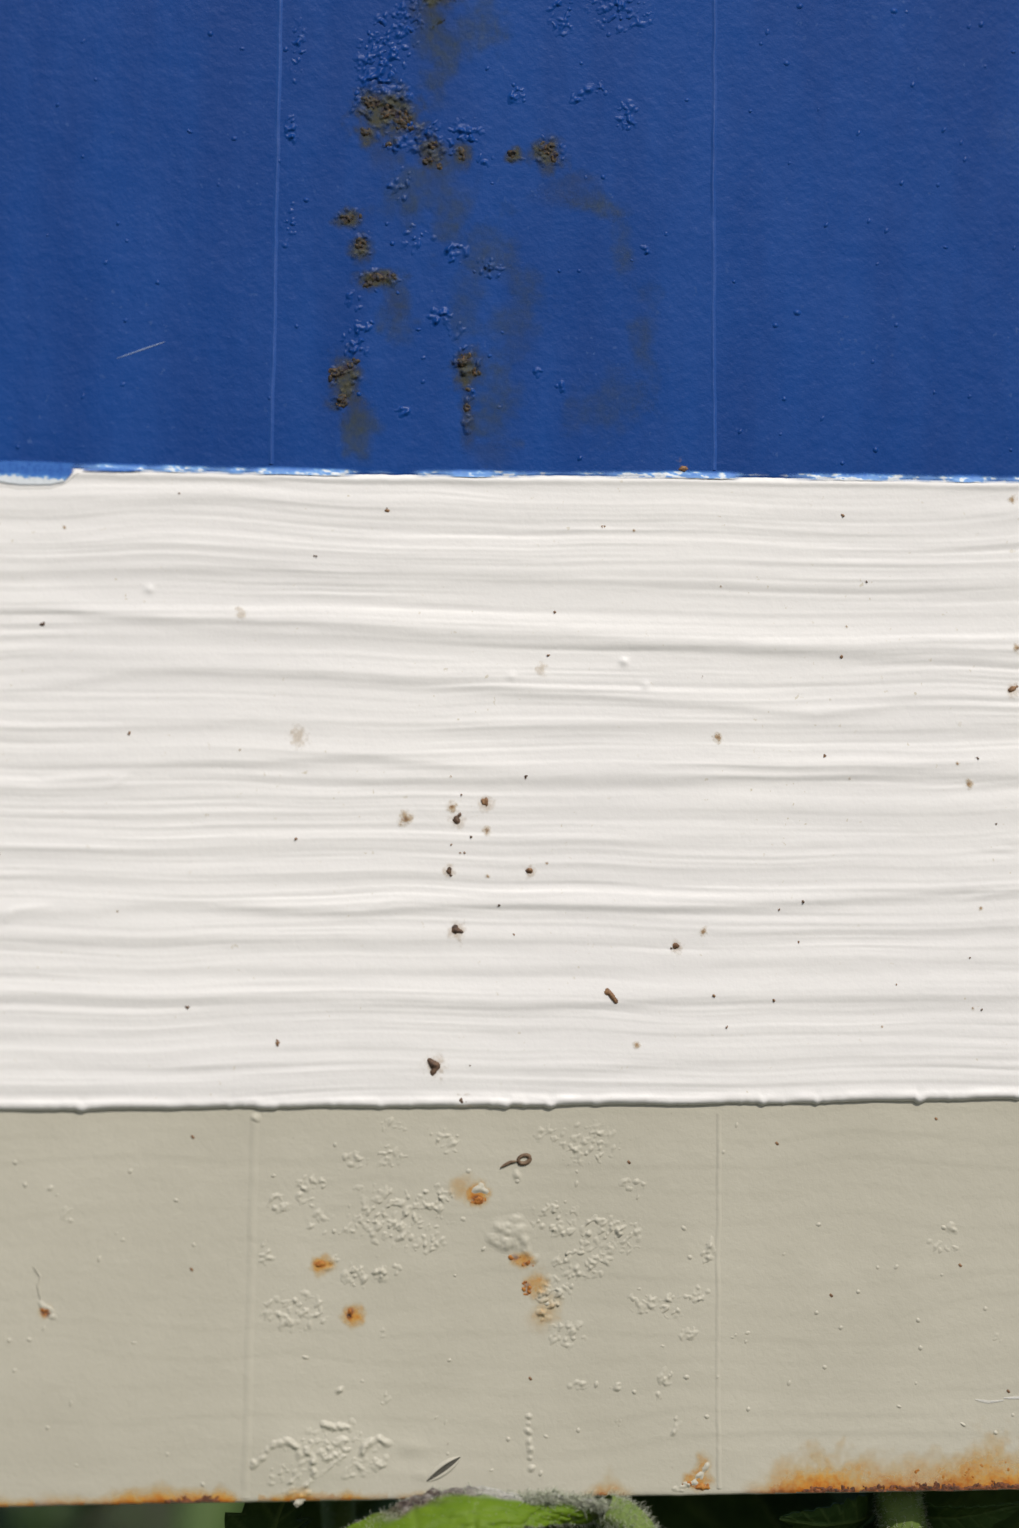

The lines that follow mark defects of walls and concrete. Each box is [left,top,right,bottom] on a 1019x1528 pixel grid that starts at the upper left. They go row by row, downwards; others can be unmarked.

rust [359,92,470,170]
rust [507,141,559,165]
rust [338,210,397,288]
rust [328,358,360,408]
rust [457,352,481,412]
rust [467,1185,486,1204]
rust [313,1259,333,1272]
rust [508,1255,541,1295]
rust [345,1307,362,1324]
rust [682,1463,710,1491]
rust [762,1455,1019,1494]
rust [71,1492,236,1505]